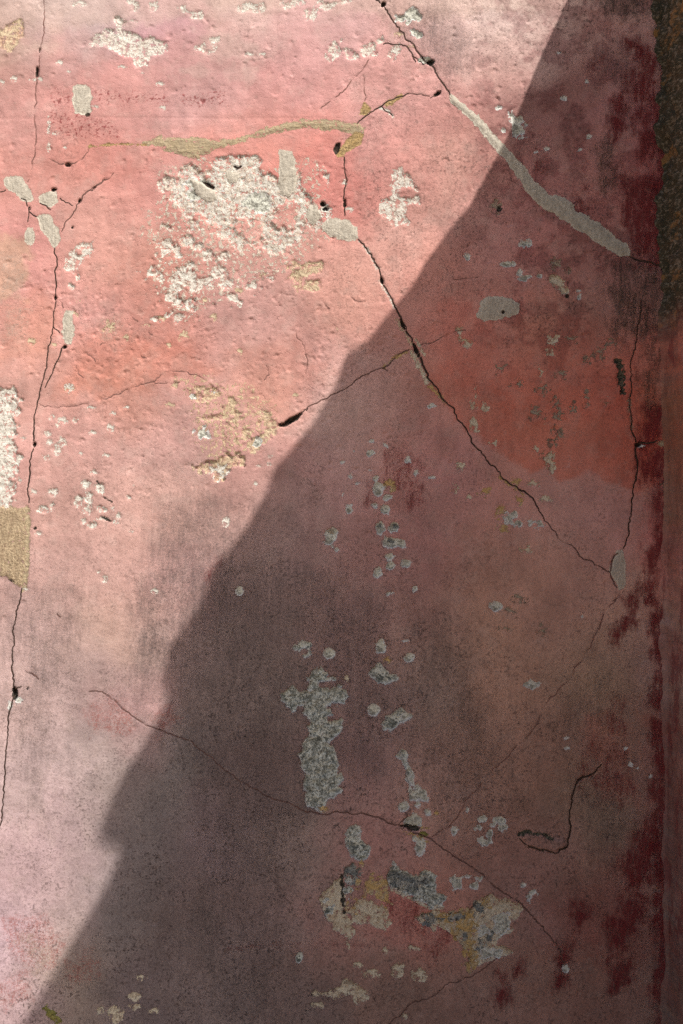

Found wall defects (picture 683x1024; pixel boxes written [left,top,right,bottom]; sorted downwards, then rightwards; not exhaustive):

flaking render [89,0,169,74]
crack [321,0,450,124]
crack [0,0,203,503]
flaking render [140,154,331,348]
crack [319,157,354,220]
flaking render [0,386,59,514]
crack [91,239,657,965]
leakage [613,483,664,700]
crack [0,588,39,826]
flaking render [280,640,349,812]
flaking render [319,824,538,975]
leakage [624,746,666,1024]